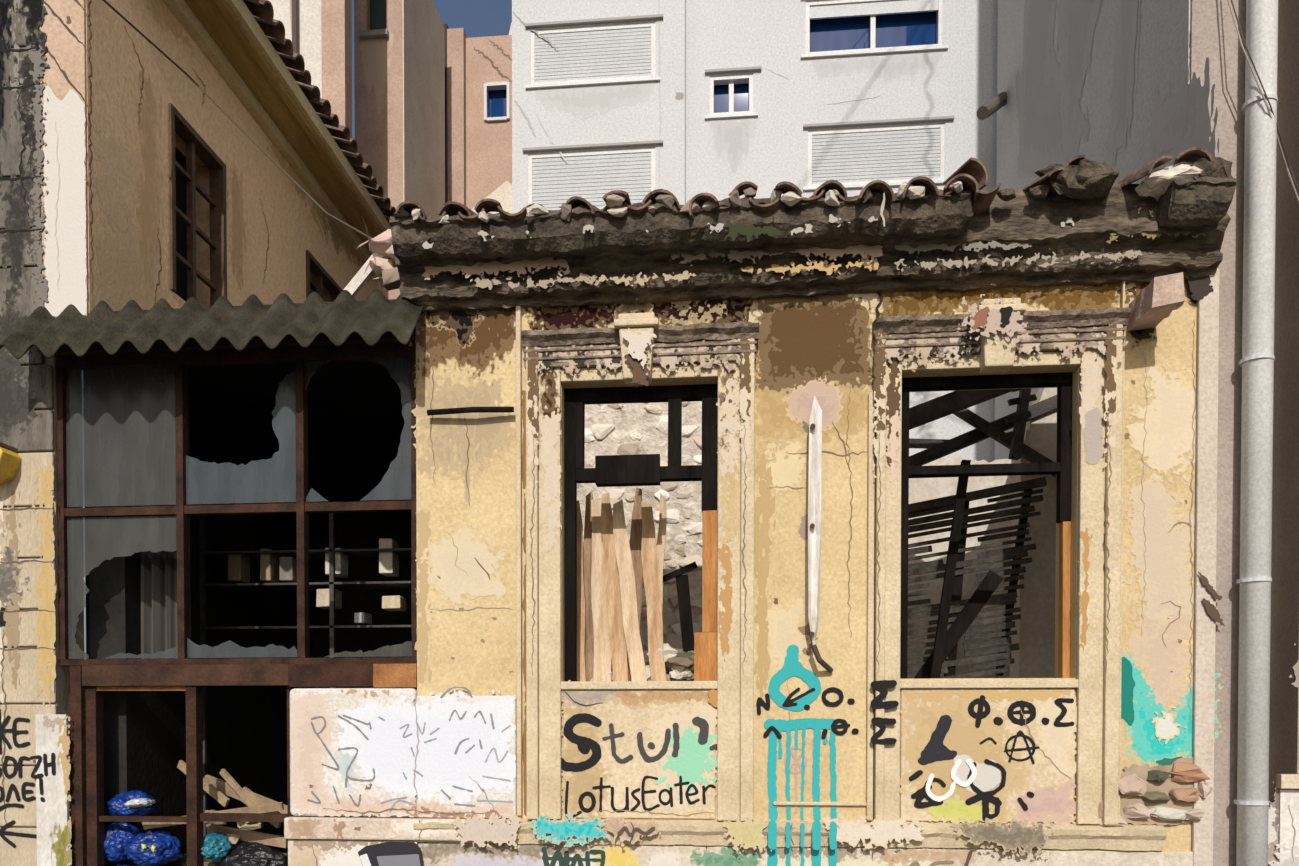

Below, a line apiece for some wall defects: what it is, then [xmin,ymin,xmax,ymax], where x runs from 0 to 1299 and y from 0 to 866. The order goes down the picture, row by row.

peeling [422,224,1142,290]
peeling [848,293,883,313]
peeling [514,299,844,553]
peeling [865,294,1225,713]
peeling [415,521,508,620]
peeling [43,716,71,828]